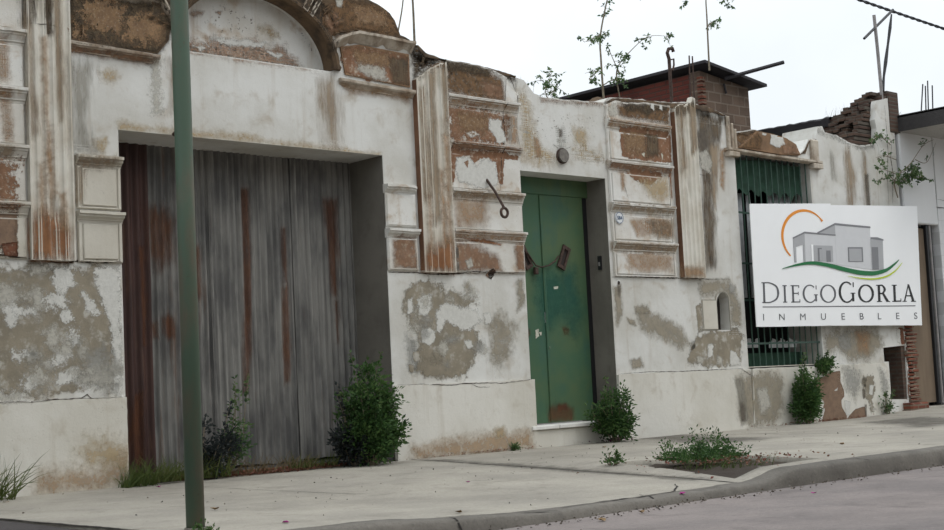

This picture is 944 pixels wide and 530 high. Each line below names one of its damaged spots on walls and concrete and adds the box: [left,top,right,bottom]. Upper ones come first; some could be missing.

water stain [291,0,399,48]
water stain [31,0,173,202]
water stain [320,82,349,152]
peeling [446,97,519,189]
spalling [619,124,672,163]
water stain [737,132,800,156]
water stain [608,101,741,328]
peeling [0,153,124,402]
corrosion [241,189,251,390]
corrosion [325,199,338,333]
peeling [402,279,491,380]
spalling [816,371,875,422]